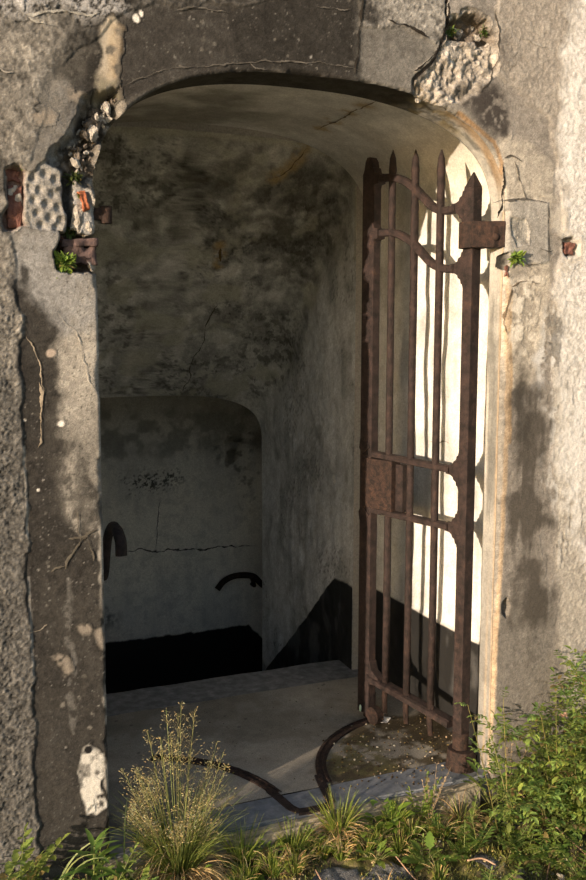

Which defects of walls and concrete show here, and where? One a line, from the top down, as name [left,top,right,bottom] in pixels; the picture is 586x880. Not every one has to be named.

crack [388,0,451,92]
spalling [412,6,501,106]
crack [480,10,500,93]
spalling [0,86,127,275]
damp [251,196,338,297]
damp [496,0,586,674]
crack [127,503,249,553]
peeling [76,743,109,817]